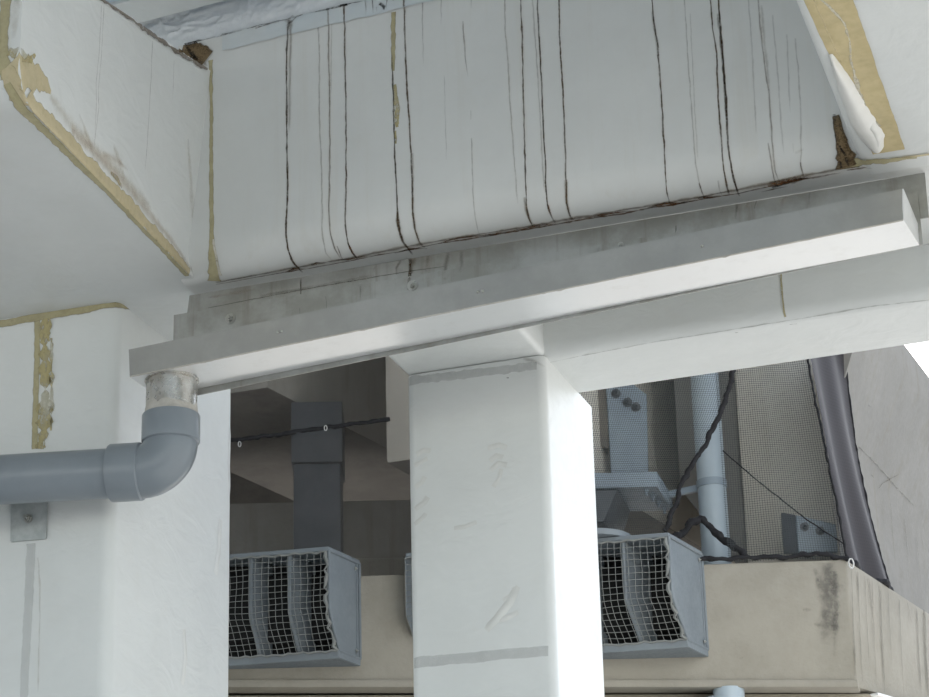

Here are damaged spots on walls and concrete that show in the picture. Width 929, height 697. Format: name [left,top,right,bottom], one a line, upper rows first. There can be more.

peeling [0,0,190,276]
peeling [101,0,222,281]
peeling [804,0,929,170]
peeling [0,302,129,449]